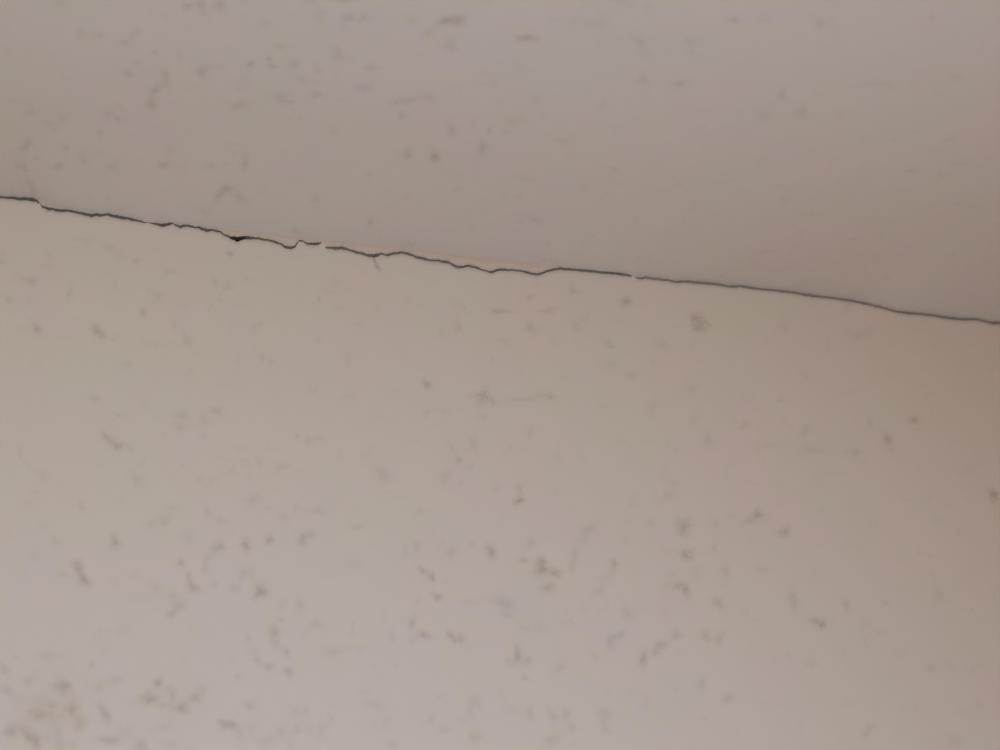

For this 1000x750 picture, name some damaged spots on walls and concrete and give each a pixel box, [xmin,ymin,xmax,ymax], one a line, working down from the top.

crack [0,196,1000,324]